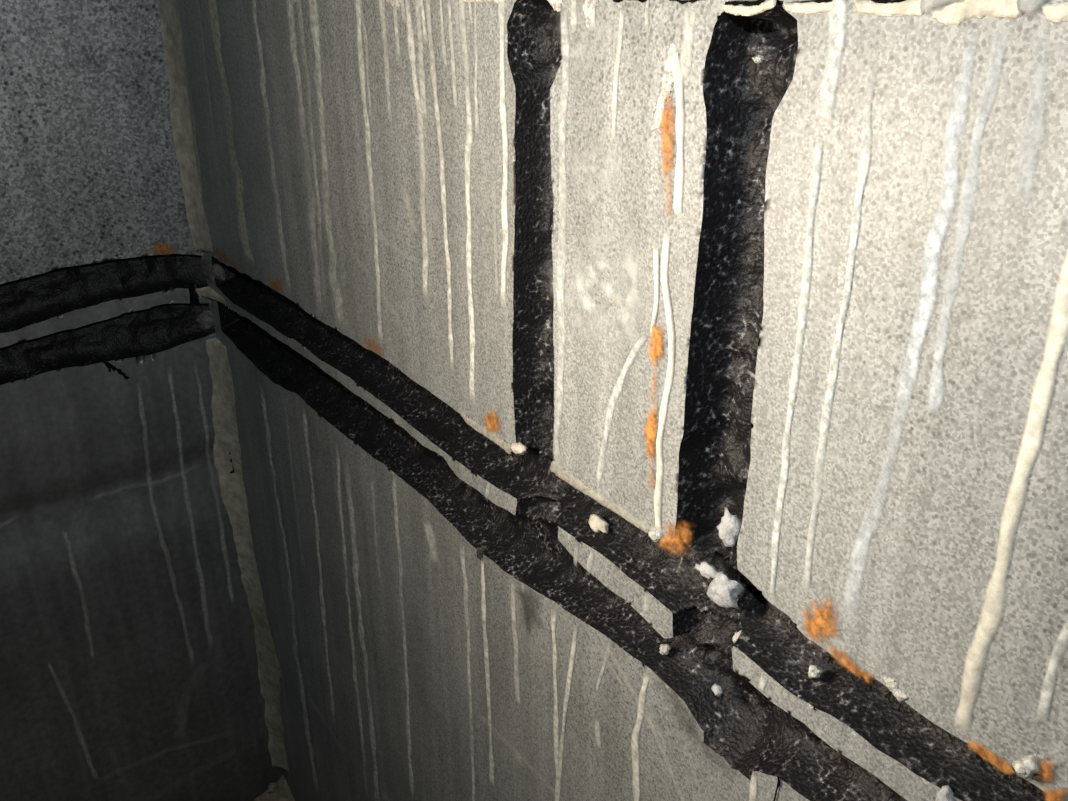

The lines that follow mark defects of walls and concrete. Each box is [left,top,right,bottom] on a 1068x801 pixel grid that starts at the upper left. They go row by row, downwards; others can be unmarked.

crack [613,0,699,8]
crack [725,0,832,8]
crack [872,0,905,8]
water stain [286,0,343,320]
water stain [355,0,382,337]
water stain [379,0,478,396]
water stain [499,0,508,300]
rust [661,100,673,172]
rust [648,326,662,366]
water stain [770,144,821,591]
rust [644,407,656,458]
rust [969,741,1013,774]